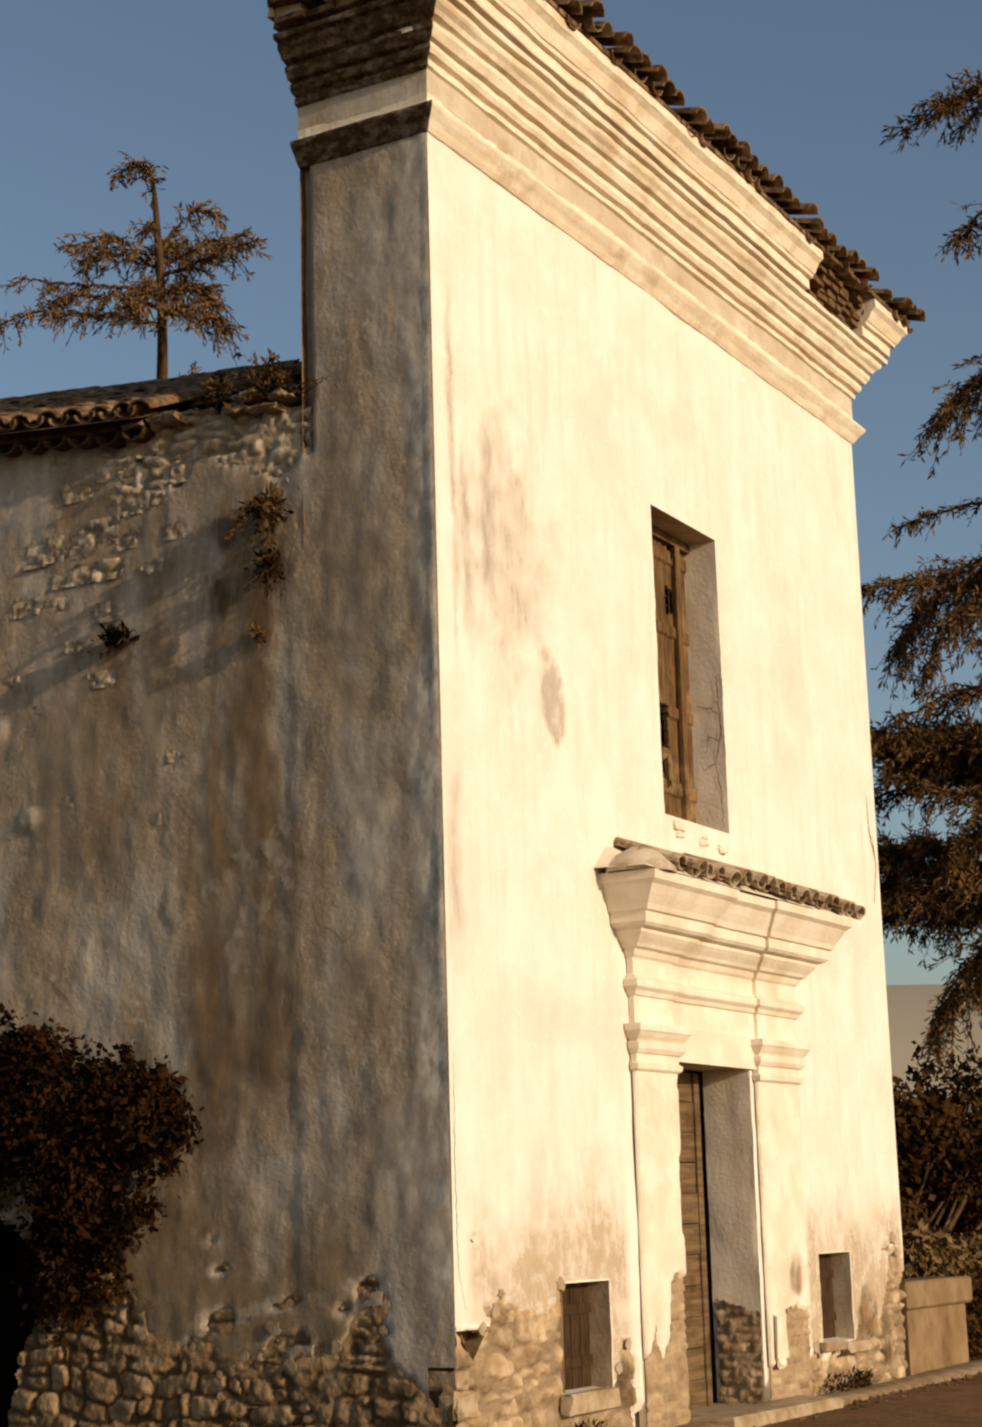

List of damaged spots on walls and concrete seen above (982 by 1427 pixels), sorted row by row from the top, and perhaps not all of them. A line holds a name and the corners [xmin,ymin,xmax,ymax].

flaking render [13,433,192,619]
flaking render [95,601,125,624]
flaking render [87,668,116,690]
water stain [190,563,300,1150]
flaking render [180,1294,311,1408]
flaking render [339,1276,390,1311]
flaking render [428,1289,513,1427]
flaking render [645,1272,691,1427]
flaking render [716,1299,824,1404]
spalling [881,1231,900,1277]